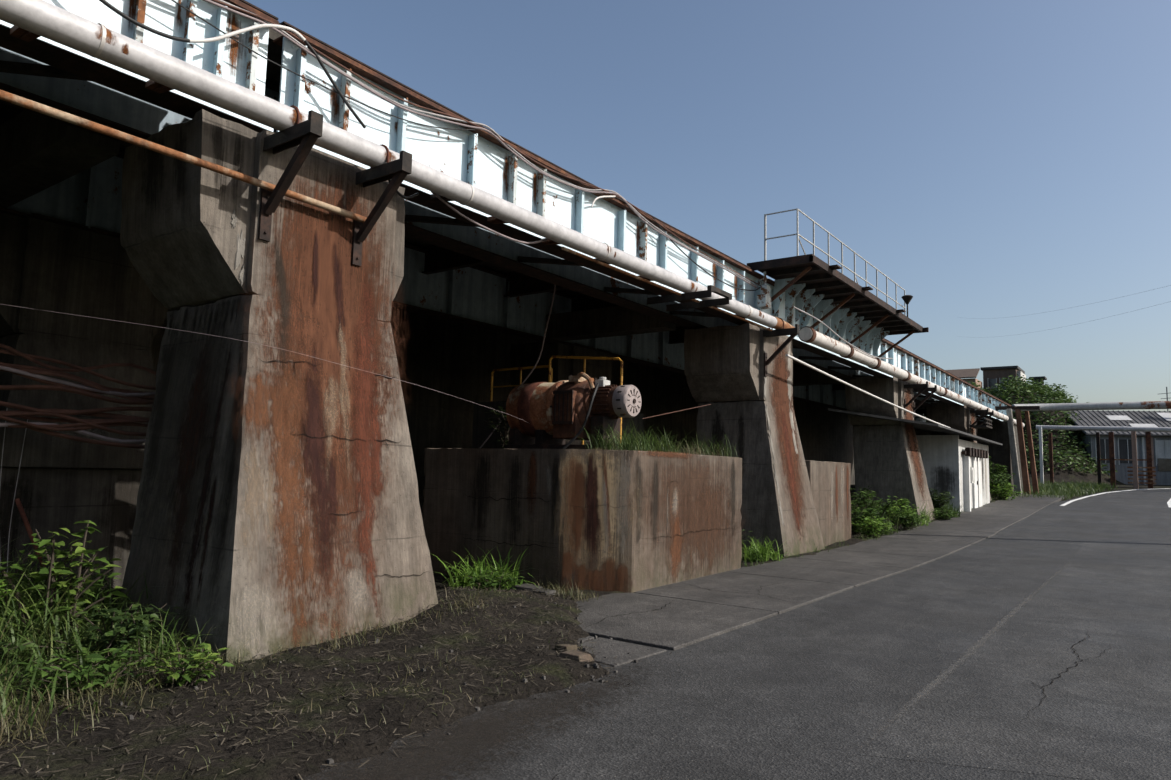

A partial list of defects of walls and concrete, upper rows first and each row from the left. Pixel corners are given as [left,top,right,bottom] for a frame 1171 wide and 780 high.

rust [97,27,129,55]
rust [242,177,397,641]
rust [561,456,632,592]
rust [770,345,803,535]